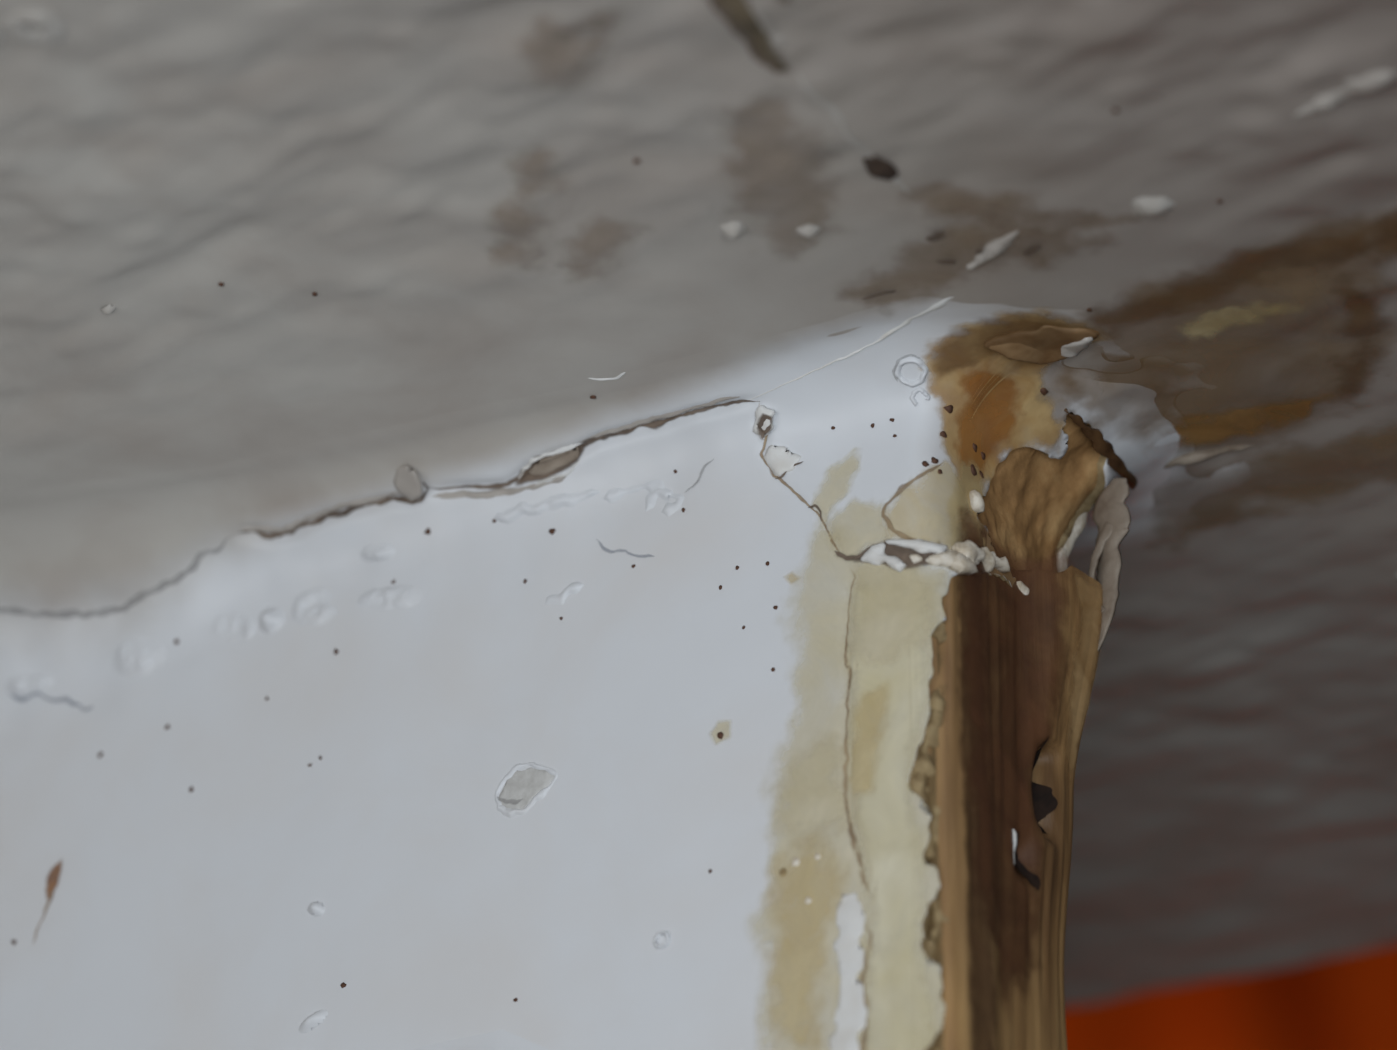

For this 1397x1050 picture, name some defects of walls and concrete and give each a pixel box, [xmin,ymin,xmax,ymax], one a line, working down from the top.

leakage [862,228,1041,301]
peeling [984,325,1099,365]
leakage [1096,235,1373,444]
spalling [834,409,1137,652]
peeling [1164,445,1254,469]
crack [234,397,872,1050]
leakage [761,533,946,1050]
spalling [910,667,946,859]
spalling [922,899,950,961]